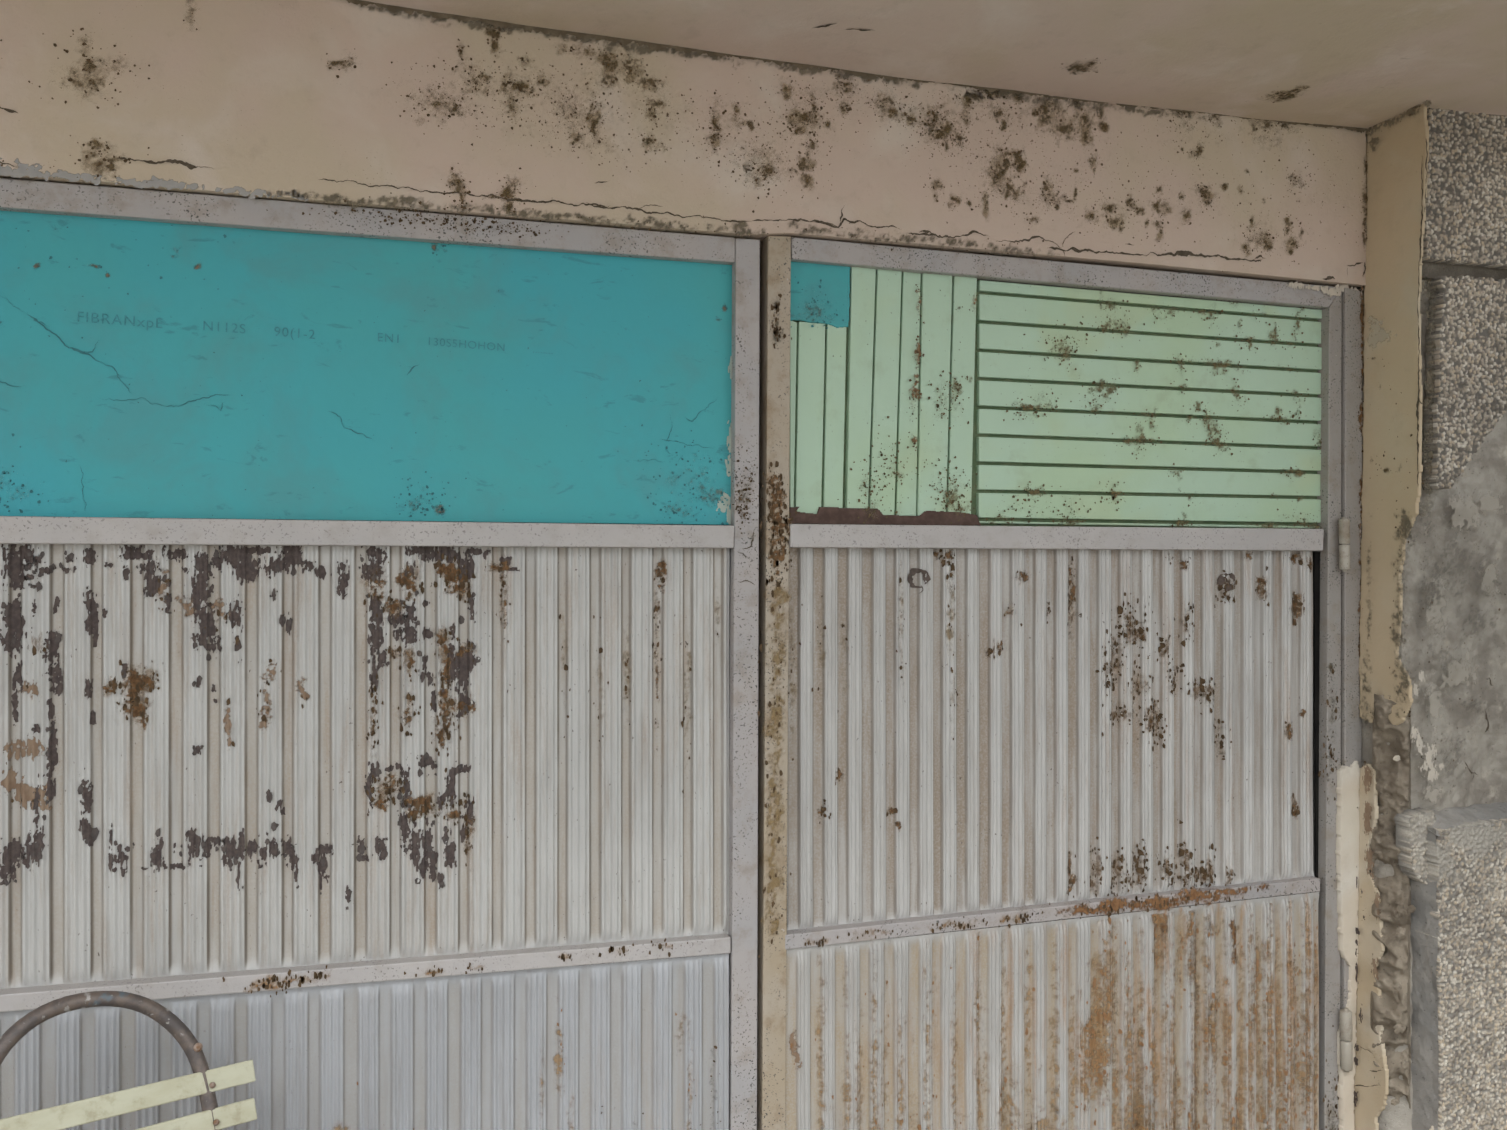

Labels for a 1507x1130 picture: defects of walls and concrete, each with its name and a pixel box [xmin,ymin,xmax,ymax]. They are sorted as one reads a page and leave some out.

damp [43,28,150,109]
damp [70,135,150,184]
crack [320,179,1263,262]
damp [385,28,1338,266]
damp [1339,100,1431,245]
corrosion [363,551,511,643]
corrosion [103,660,160,730]
corrosion [366,627,476,773]
corrosion [757,461,819,958]
corrosion [1096,592,1232,760]
spalling [1354,671,1444,1109]
corrosion [789,837,1339,1130]